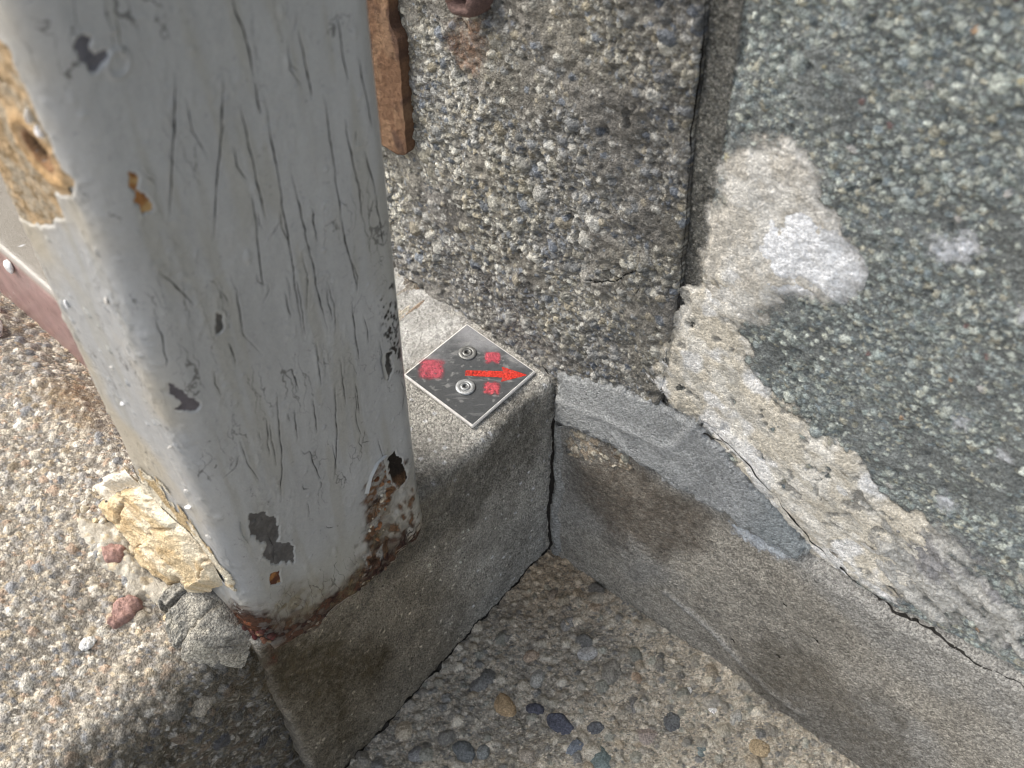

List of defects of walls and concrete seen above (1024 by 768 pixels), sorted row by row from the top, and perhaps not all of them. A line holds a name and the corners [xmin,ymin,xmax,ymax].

peeling [24,108,45,138]
peeling [73,35,108,72]
rust [128,172,153,213]
crack [674,2,706,329]
leakage [700,133,868,326]
peeling [168,383,200,411]
peeling [646,267,935,606]
spalling [78,515,170,629]
peeling [248,511,294,564]
rust [230,462,421,645]
crack [344,368,565,768]
crack [683,401,1024,687]